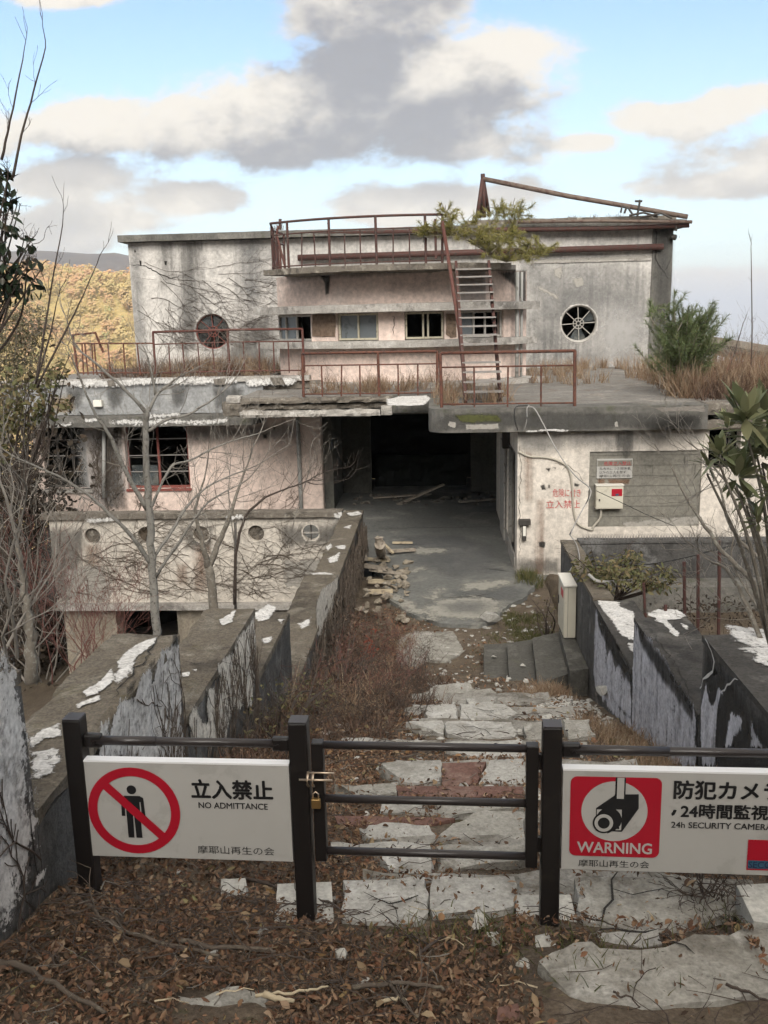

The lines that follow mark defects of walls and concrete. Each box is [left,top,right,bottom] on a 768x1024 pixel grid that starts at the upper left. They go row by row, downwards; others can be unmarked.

leakage [218,390,239,405]
peeling [386,395,430,406]
leakage [599,617,631,683]
leakage [637,625,693,720]